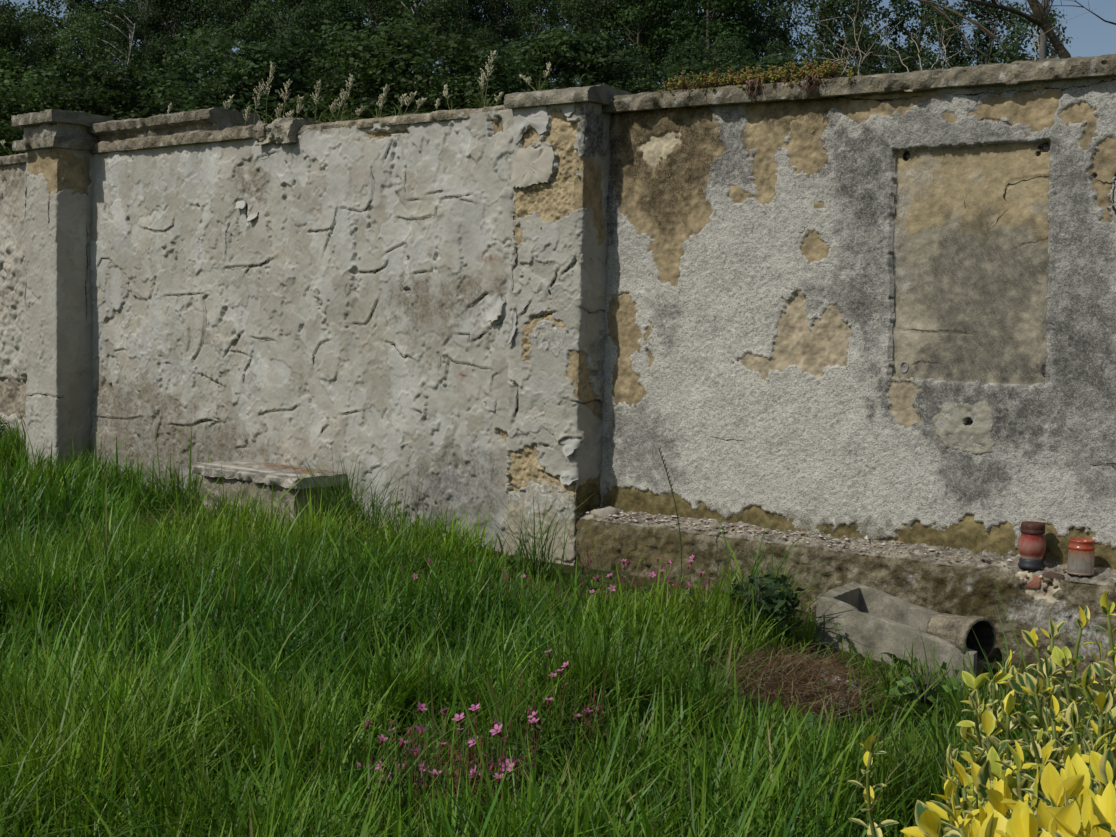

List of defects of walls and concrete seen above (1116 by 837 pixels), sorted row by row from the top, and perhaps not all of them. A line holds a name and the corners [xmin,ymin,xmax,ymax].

crack [167,293,270,384]
crack [225,204,272,273]
crack [311,142,472,273]
crack [438,191,577,417]
peeling [491,102,726,287]
peeling [564,292,659,420]
peeling [727,89,942,213]
leakage [769,97,954,349]
leakage [866,138,1116,506]
peeling [942,84,1116,222]
crack [1098,173,1116,215]
peeling [885,514,1028,556]